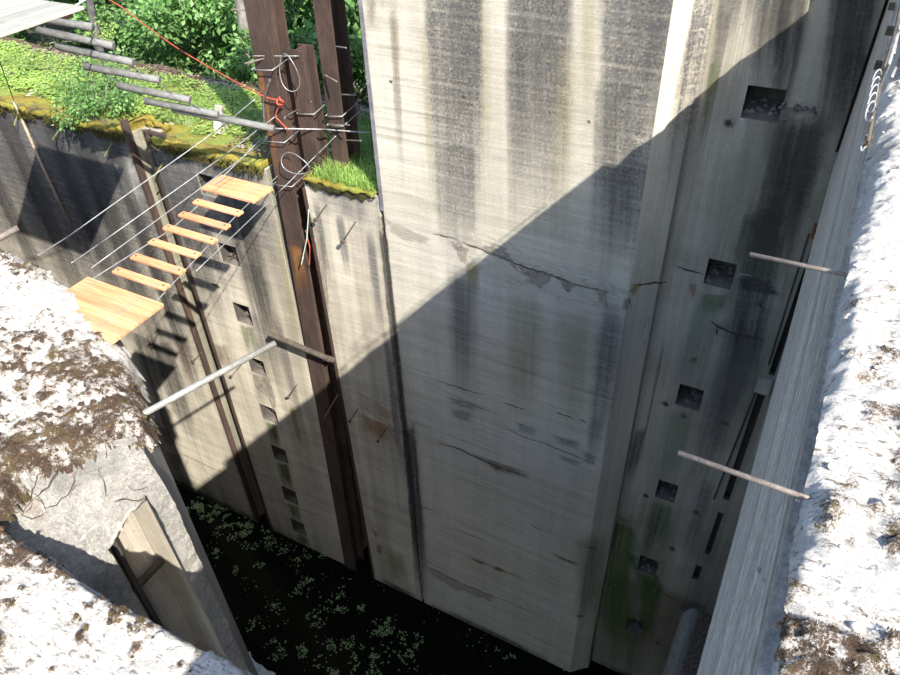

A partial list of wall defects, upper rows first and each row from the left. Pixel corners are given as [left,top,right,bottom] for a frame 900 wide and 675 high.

water stain [427,0,481,161]
water stain [509,0,569,126]
water stain [678,0,737,111]
water stain [756,0,805,75]
water stain [369,239,381,310]
crack [432,233,704,308]
crack [22,469,147,520]
water stain [385,343,424,561]
crack [352,218,596,625]